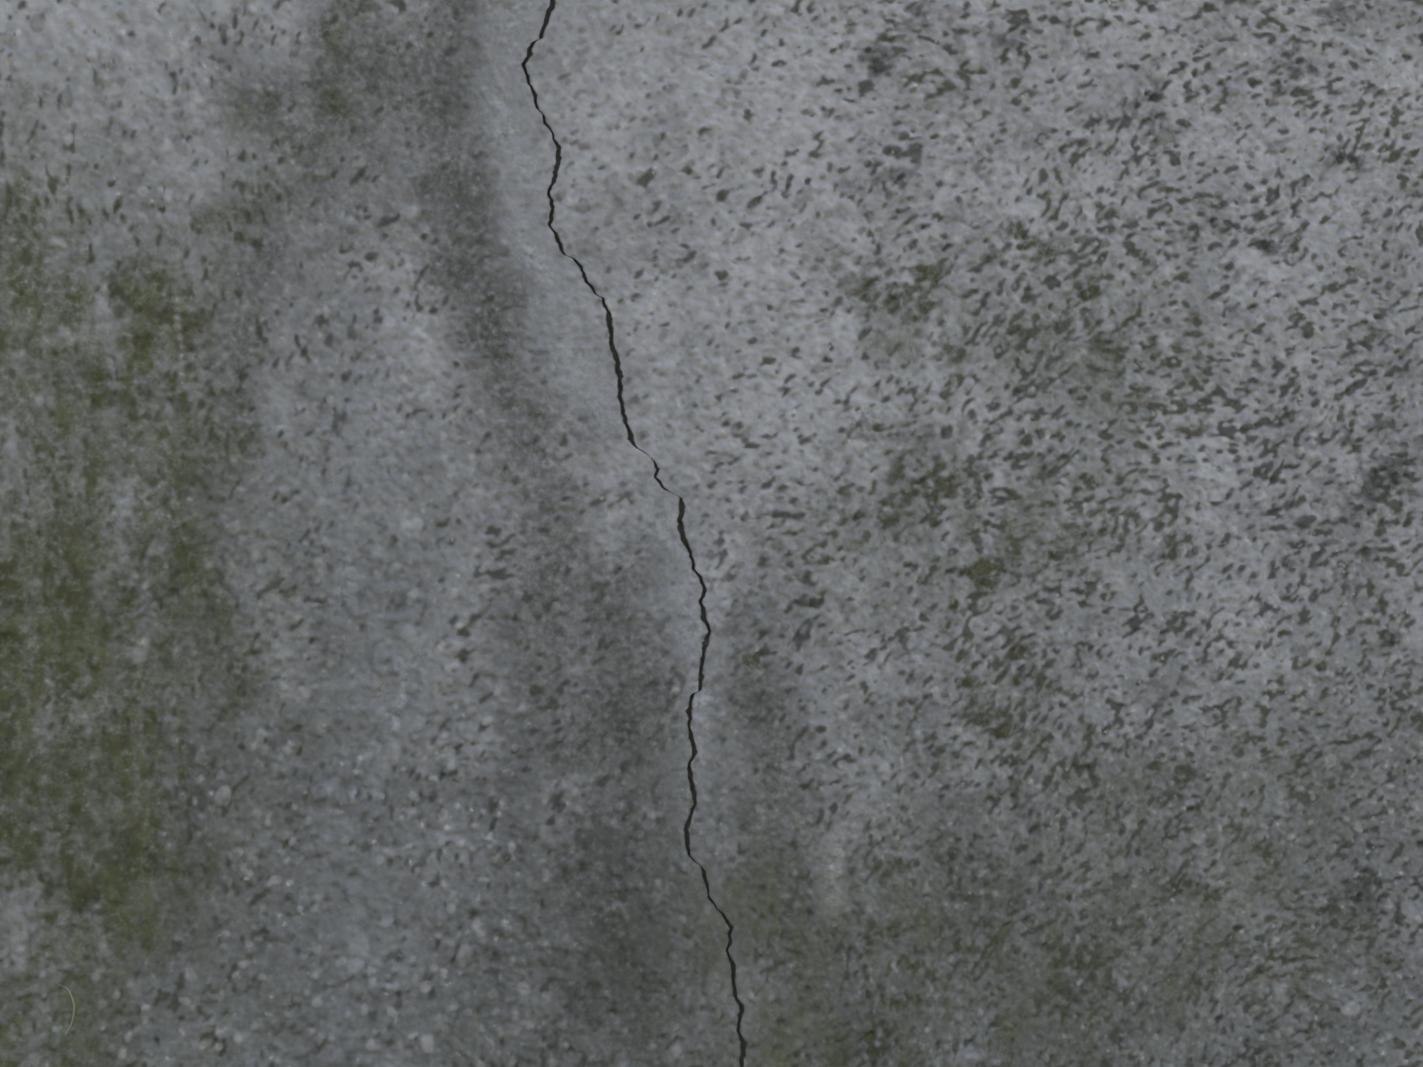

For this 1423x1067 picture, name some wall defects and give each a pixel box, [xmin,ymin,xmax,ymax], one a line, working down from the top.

crack [521,0,747,1067]